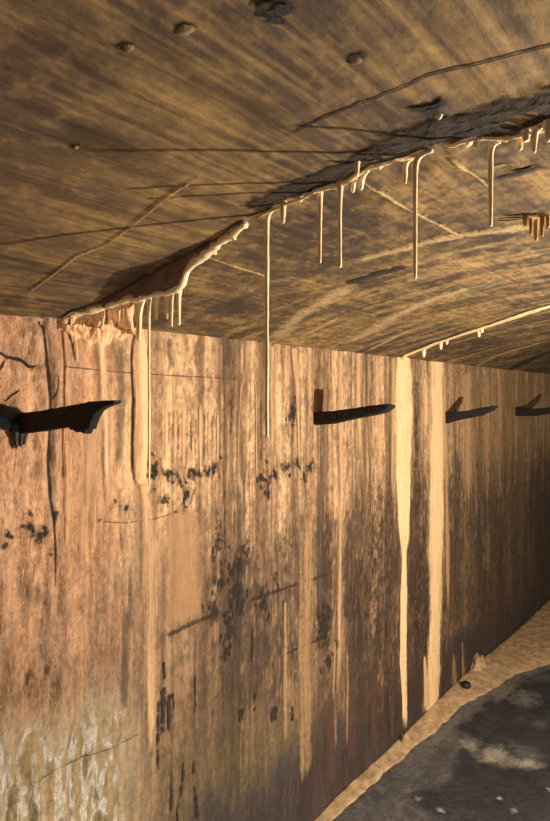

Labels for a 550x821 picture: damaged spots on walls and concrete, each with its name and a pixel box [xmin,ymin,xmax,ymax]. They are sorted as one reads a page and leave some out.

peeling [256,0,296,25]
spalling [247,89,550,210]
crack [284,45,550,137]
crack [0,113,550,485]
leakage [275,266,406,337]
leakage [352,289,467,341]
leakage [359,216,536,261]
leakage [231,347,315,498]
crack [47,431,57,582]
leakage [141,407,222,768]
leakage [202,512,278,663]
leakage [270,357,500,788]